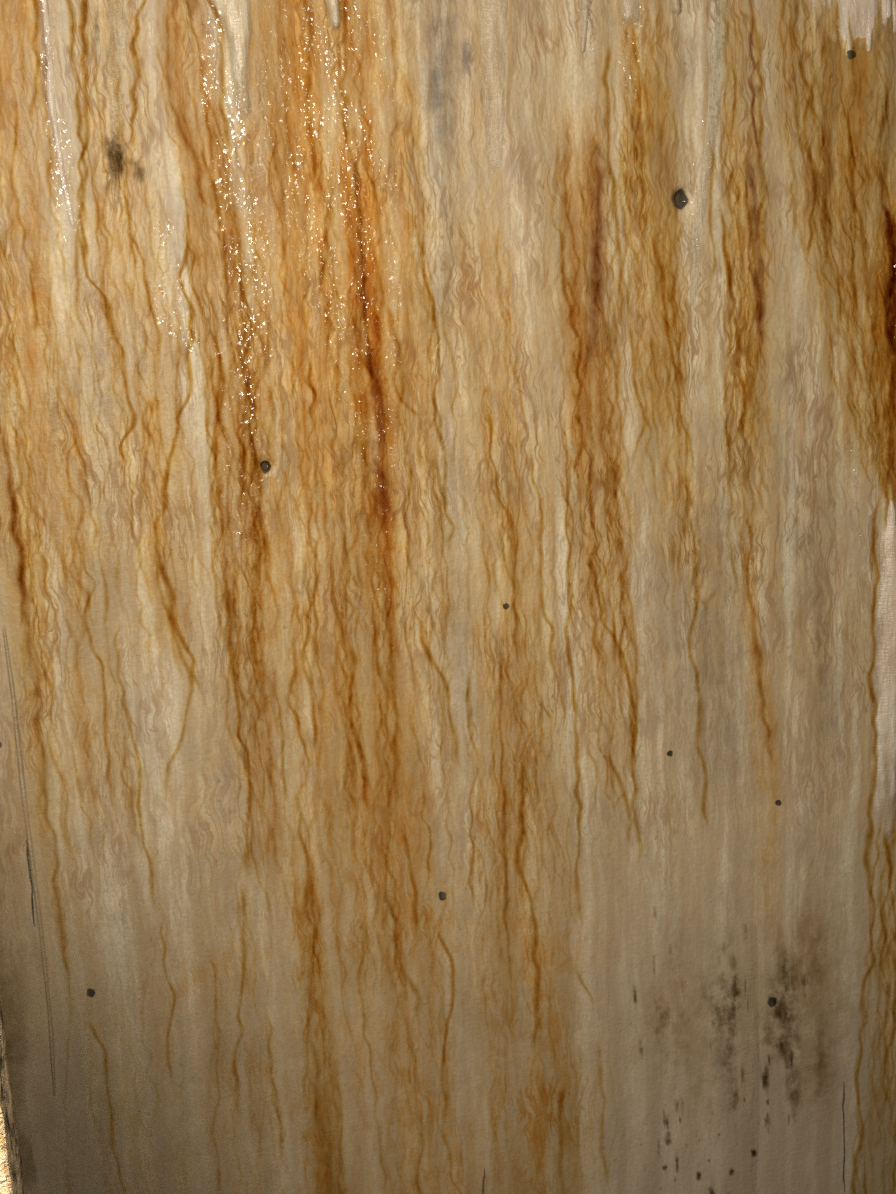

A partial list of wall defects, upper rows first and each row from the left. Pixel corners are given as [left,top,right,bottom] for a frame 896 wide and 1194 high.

corrosion [885,210,896,344]
damp [872,499,896,811]
damp [3,629,55,1095]